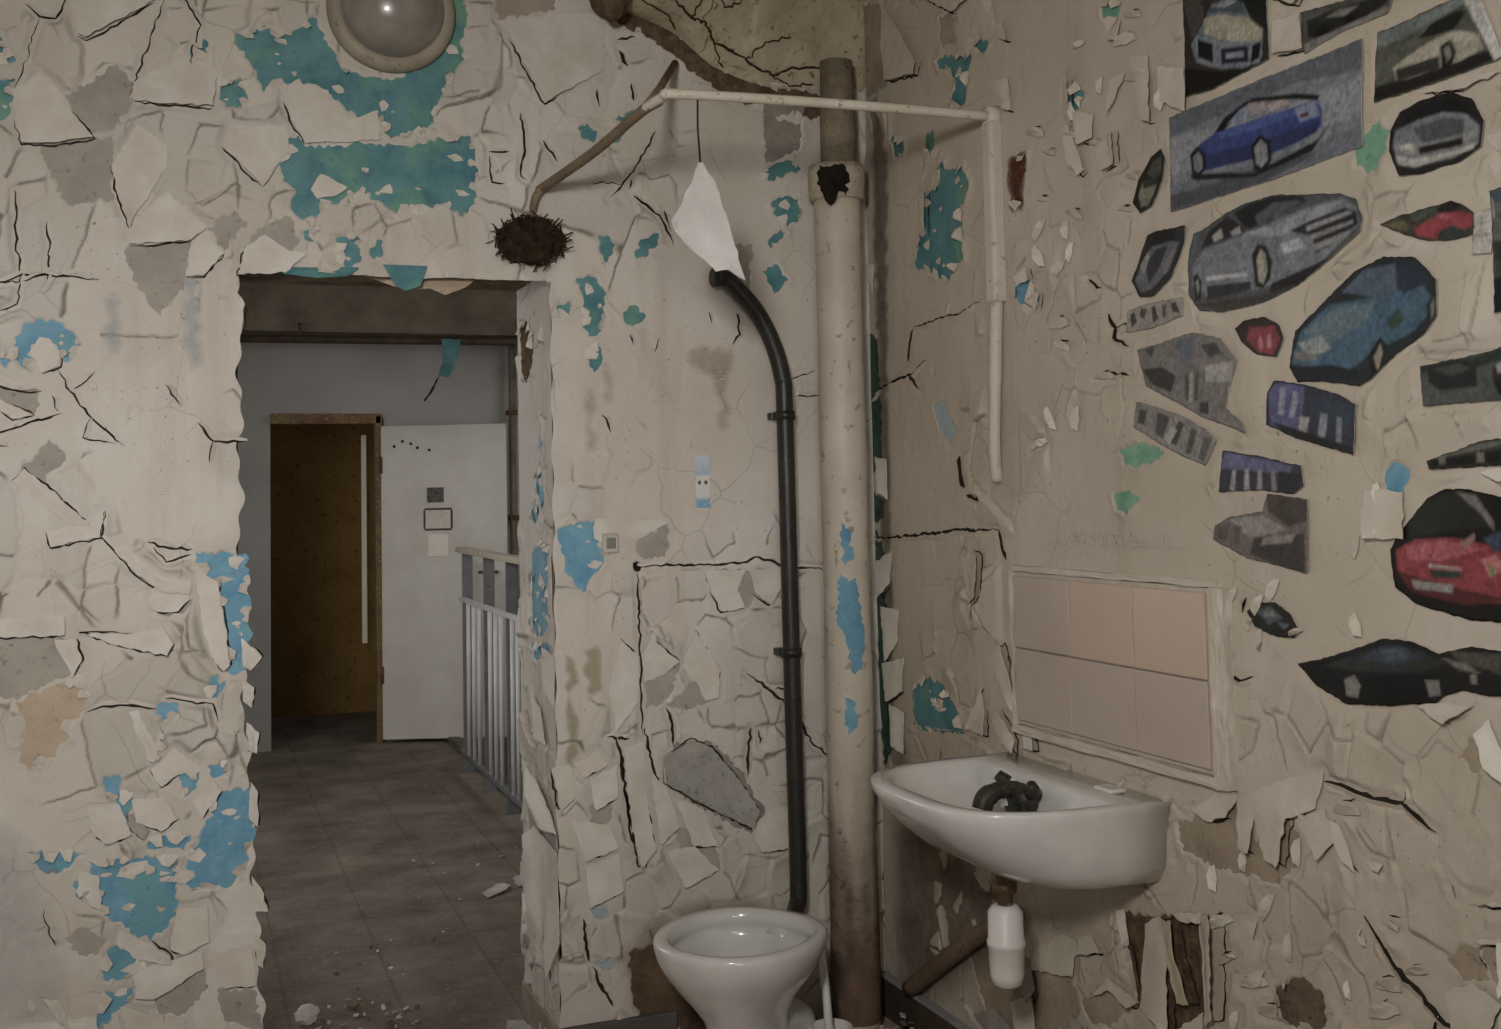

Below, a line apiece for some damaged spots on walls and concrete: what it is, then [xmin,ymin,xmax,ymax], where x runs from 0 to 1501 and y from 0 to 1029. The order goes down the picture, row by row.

peeling [0,0,480,332]
peeling [557,236,646,372]
peeling [495,0,820,120]
corrosion [1007,152,1026,211]
peeling [0,440,264,775]
peeling [0,702,269,1029]
peeling [526,518,670,745]
peeling [522,629,789,980]
crack [607,552,827,868]
crack [875,456,1006,560]
peeling [970,772,1383,1029]
crack [1363,916,1451,1029]